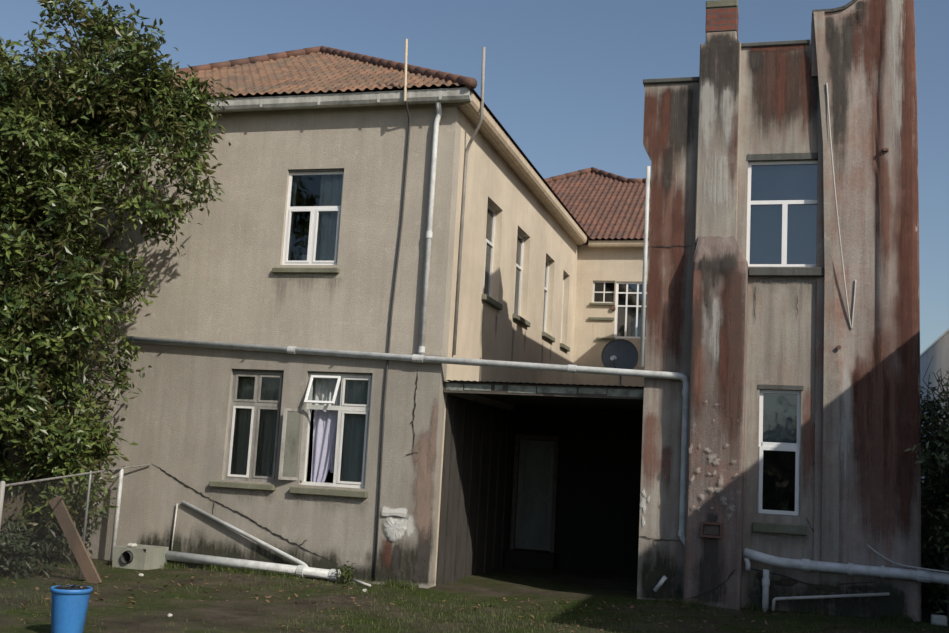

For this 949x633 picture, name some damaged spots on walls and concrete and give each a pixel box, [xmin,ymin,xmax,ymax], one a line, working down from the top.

damp [659,1,866,207]
rust [751,44,812,128]
rust [643,89,705,418]
rust [849,0,921,536]
damp [140,527,433,584]
crack [407,370,418,455]
spalling [689,444,739,517]
rust [719,271,746,448]